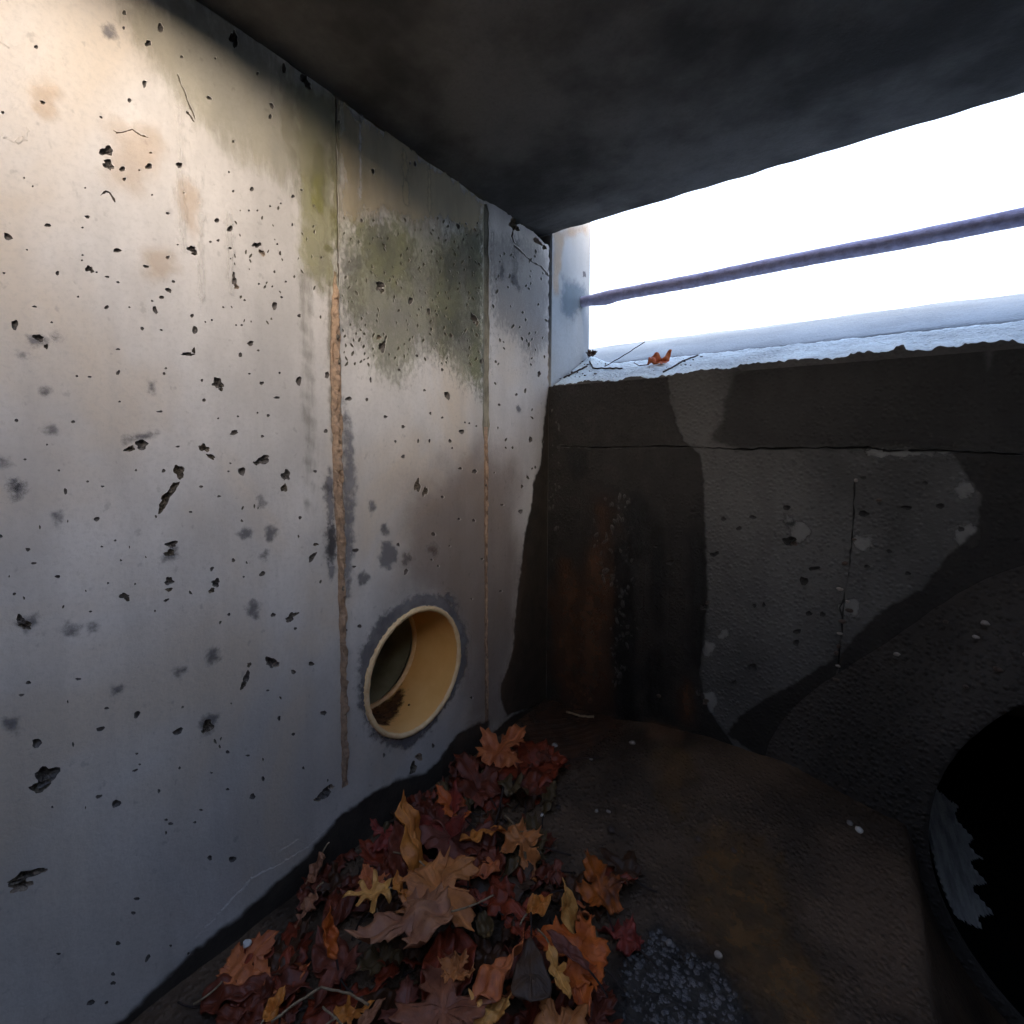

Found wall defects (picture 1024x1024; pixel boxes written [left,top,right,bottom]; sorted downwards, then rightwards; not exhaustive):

crack [560,445,1024,456]
crack [833,478,882,681]
damp [116,377,1024,1024]